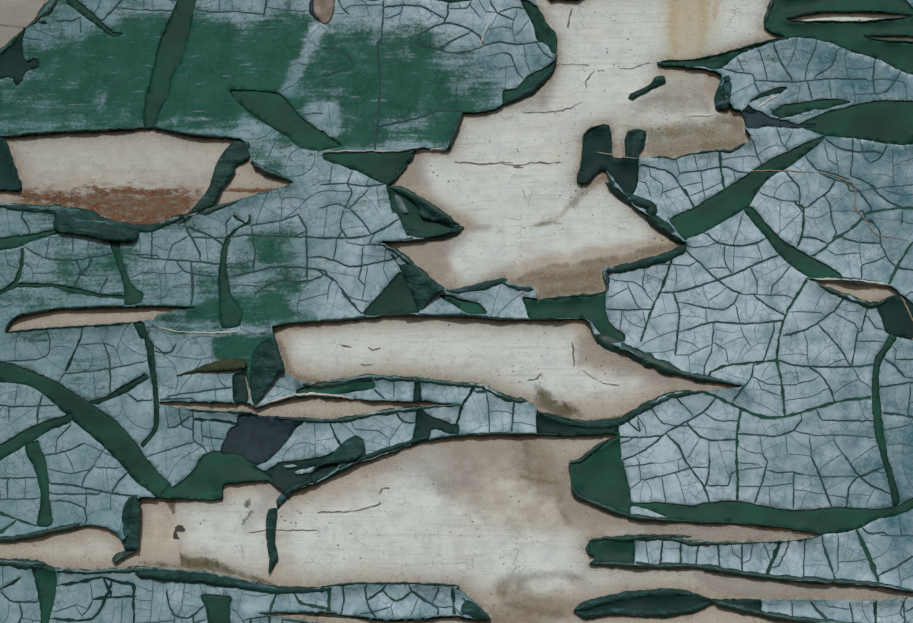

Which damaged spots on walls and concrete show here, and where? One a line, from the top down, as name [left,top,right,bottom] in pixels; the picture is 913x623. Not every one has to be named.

peeling [0,0,59,86]
crack [0,0,307,130]
peeling [309,0,334,24]
crack [338,0,908,152]
rust [19,182,199,225]
peeling [0,126,293,241]
peeling [323,0,913,312]
crack [0,90,401,534]
crack [329,344,515,446]
peeling [0,272,913,623]
crack [606,127,913,623]
crack [0,561,464,623]